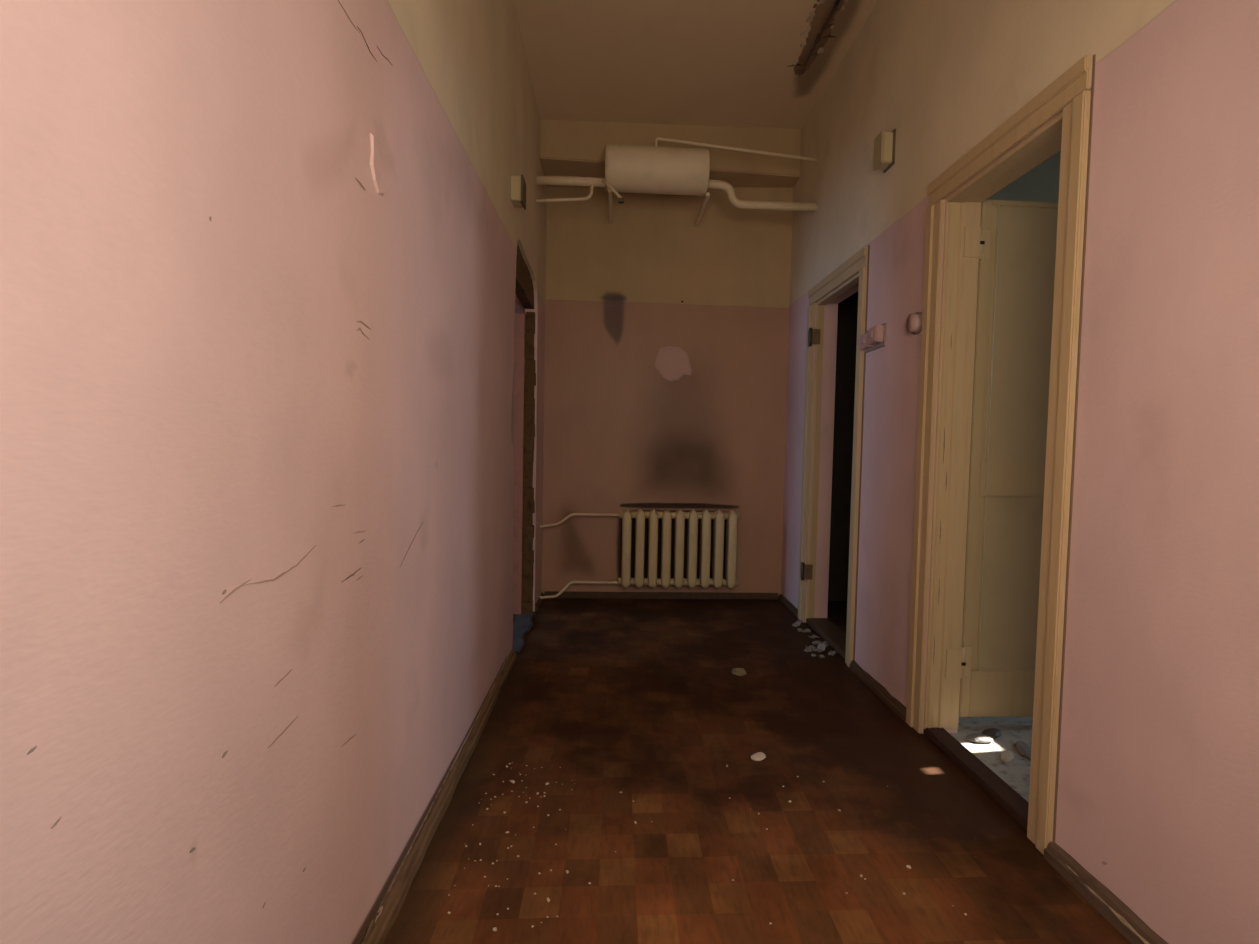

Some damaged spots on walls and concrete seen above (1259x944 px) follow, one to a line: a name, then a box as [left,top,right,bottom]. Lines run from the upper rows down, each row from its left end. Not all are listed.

crack [338,0,393,66]
flaking render [794,0,848,75]